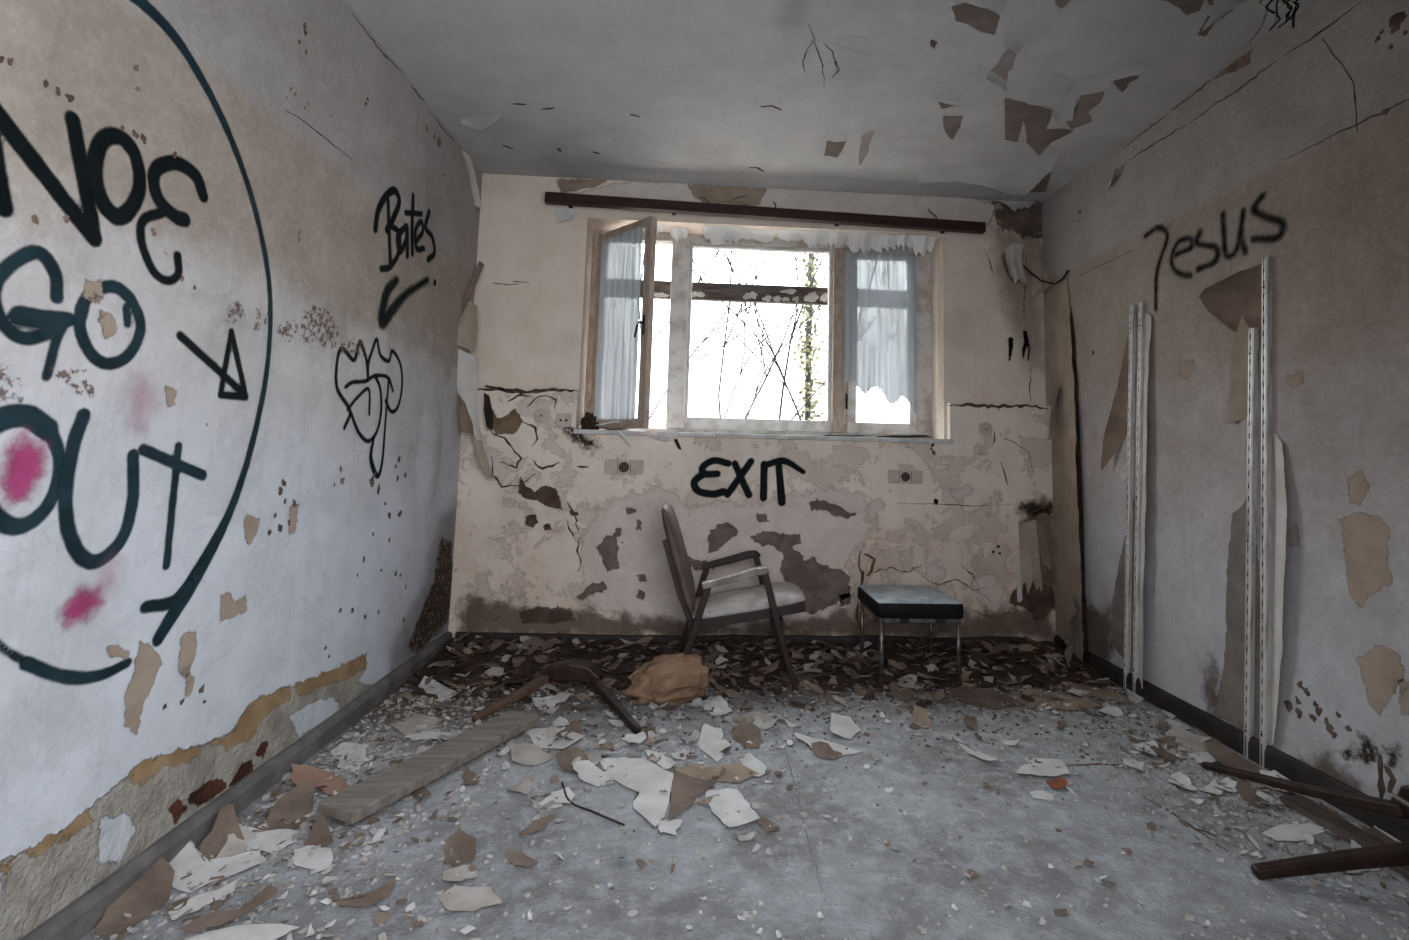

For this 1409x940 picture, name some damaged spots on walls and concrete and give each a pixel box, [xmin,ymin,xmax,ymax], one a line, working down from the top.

crack [352,14,454,141]
peeling [824,435,936,455]
crack [567,502,581,572]
peeling [487,394,885,636]
peeling [1338,470,1393,608]
peeling [220,592,247,621]
crack [871,563,1012,618]
flaking render [972,574,1055,620]
peeling [1283,680,1352,739]
peeling [1356,645,1409,716]
peeling [955,679,1297,859]
peeling [235,754,533,940]